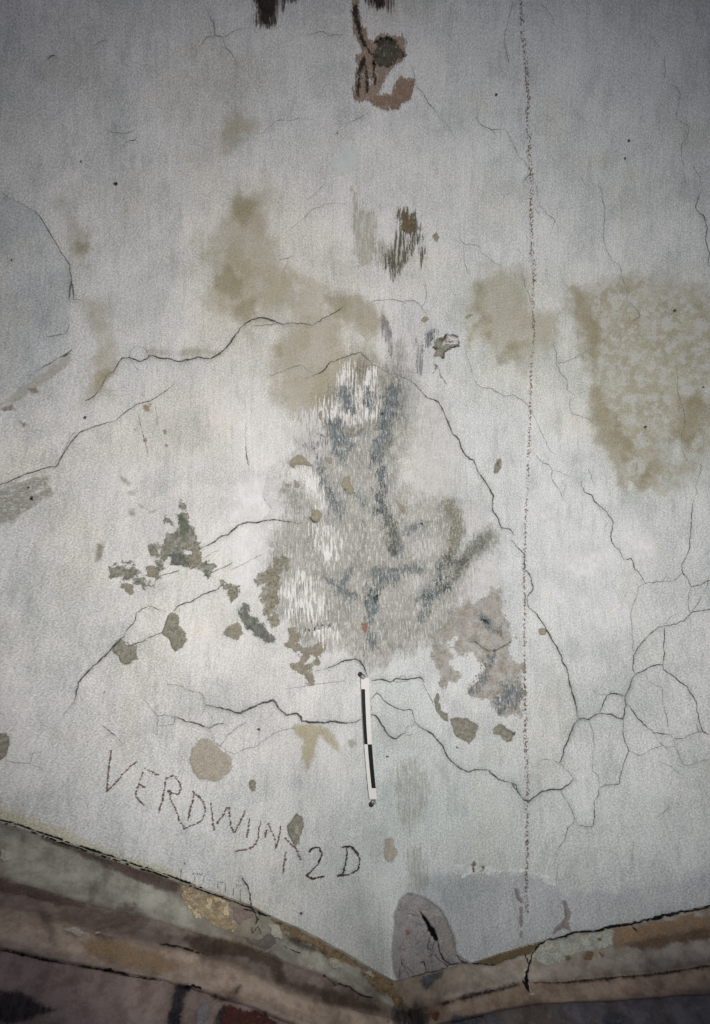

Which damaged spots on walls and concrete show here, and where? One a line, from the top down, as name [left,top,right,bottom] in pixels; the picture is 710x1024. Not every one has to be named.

crack [35,211,74,298]
water stain [351,188,439,280]
crack [0,307,343,485]
water stain [226,205,502,671]
flaking render [422,317,460,359]
water stain [577,275,710,488]
peeling [108,499,326,686]
crack [157,352,710,870]
peeling [418,586,527,748]
peeling [190,739,232,781]
crack [522,905,710,992]